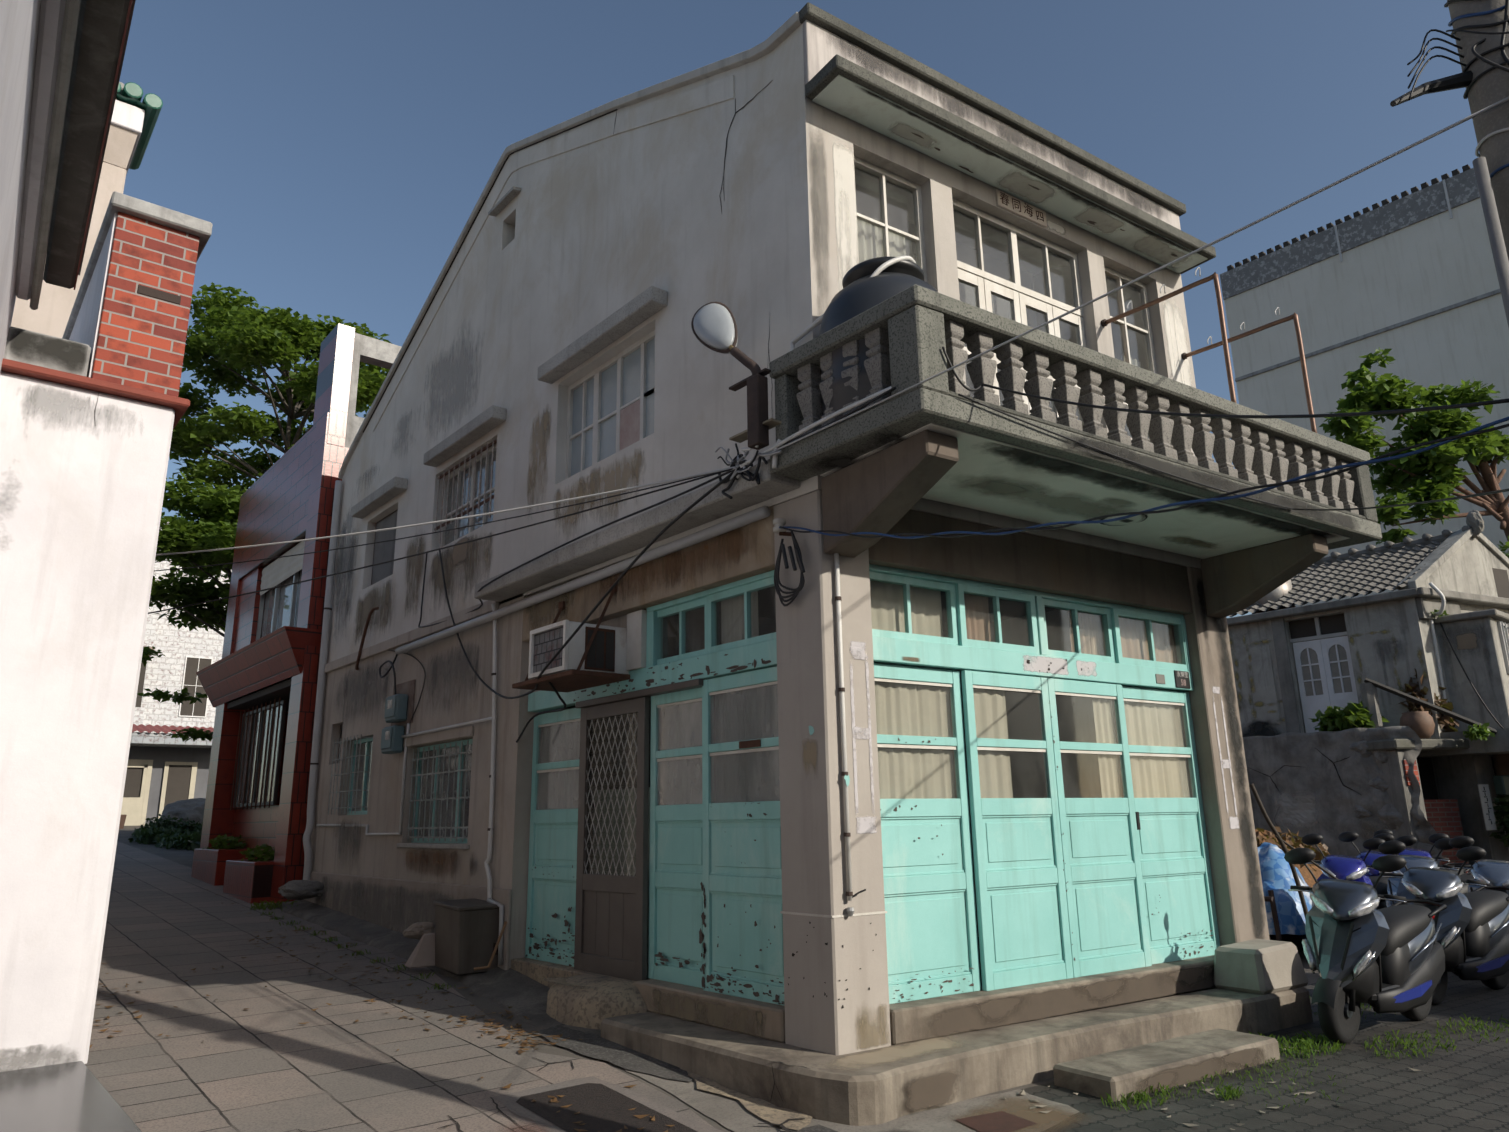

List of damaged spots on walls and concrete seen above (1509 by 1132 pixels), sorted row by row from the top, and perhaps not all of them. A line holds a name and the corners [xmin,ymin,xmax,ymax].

crack [719,82,771,212]
leakage [30,387,111,420]
leakage [528,411,550,493]
leakage [556,453,641,524]
leakage [337,513,492,635]
crack [1248,748,1361,833]
peeling [526,907,575,966]
peeling [654,882,804,1004]